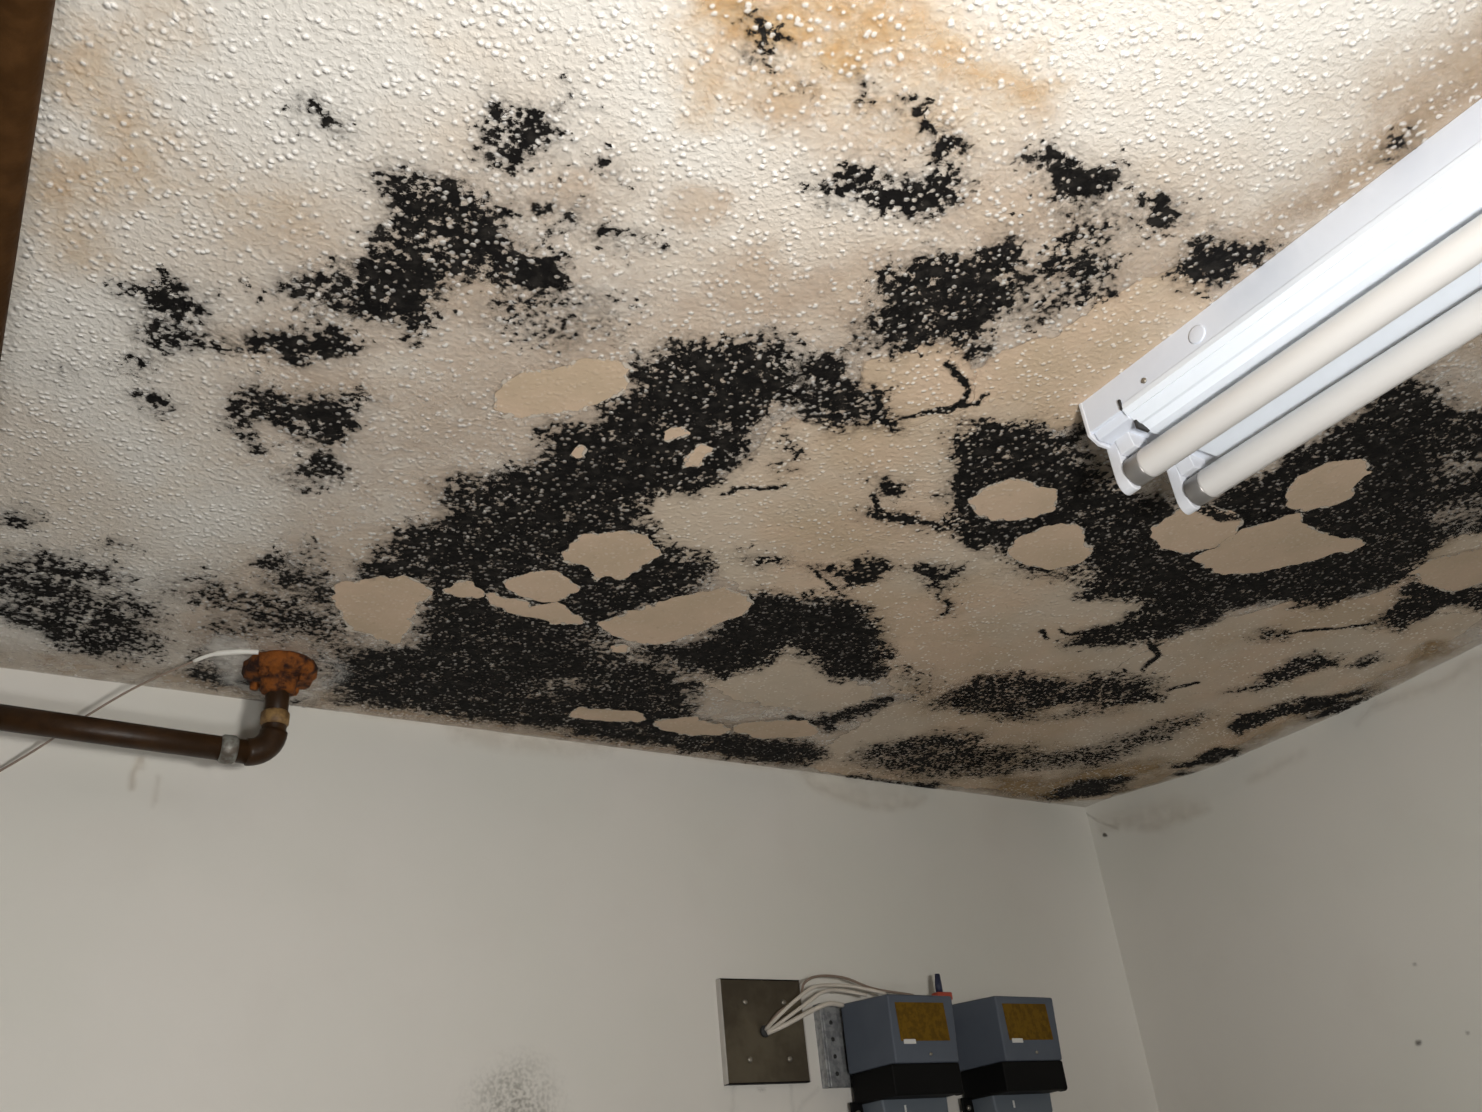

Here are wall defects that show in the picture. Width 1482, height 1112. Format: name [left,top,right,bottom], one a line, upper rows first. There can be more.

damp [0,0,1482,802]
peeling [330,265,1482,800]